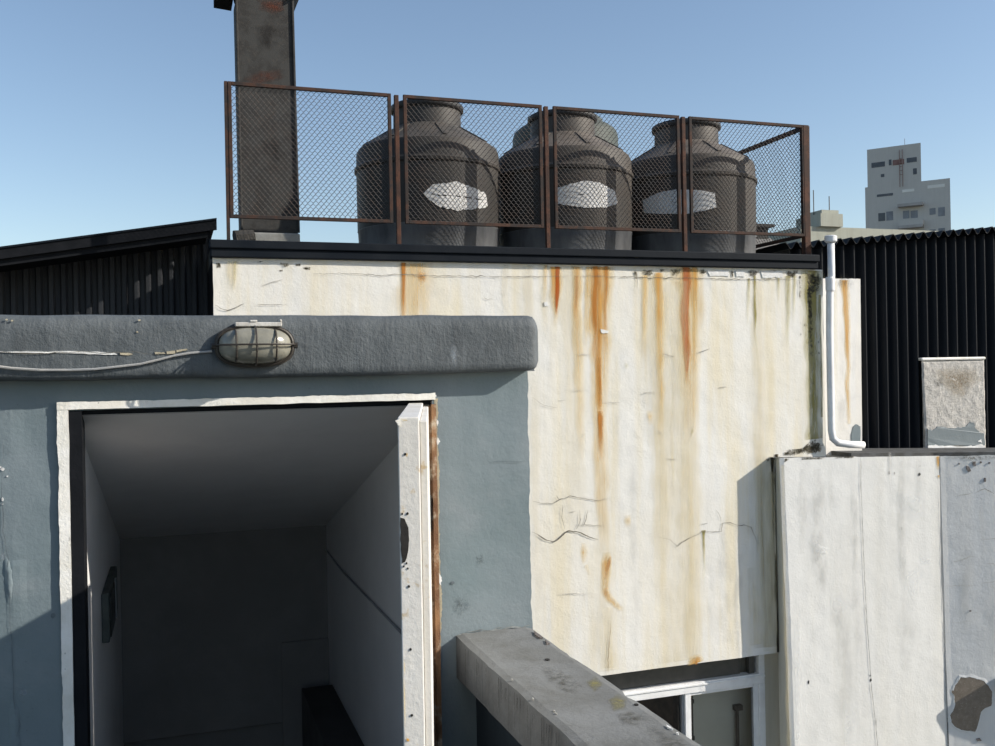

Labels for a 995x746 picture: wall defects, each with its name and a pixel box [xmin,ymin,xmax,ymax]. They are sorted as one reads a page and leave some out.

corrosion [401,263,424,308]
corrosion [551,267,561,311]
corrosion [681,267,697,375]
corrosion [573,266,608,442]
water stain [813,365,822,423]
spalling [927,440,985,448]
spalling [400,513,409,569]
crack [509,496,608,542]
crack [675,477,764,578]
corrosion [602,558,614,604]
peeling [949,674,995,741]